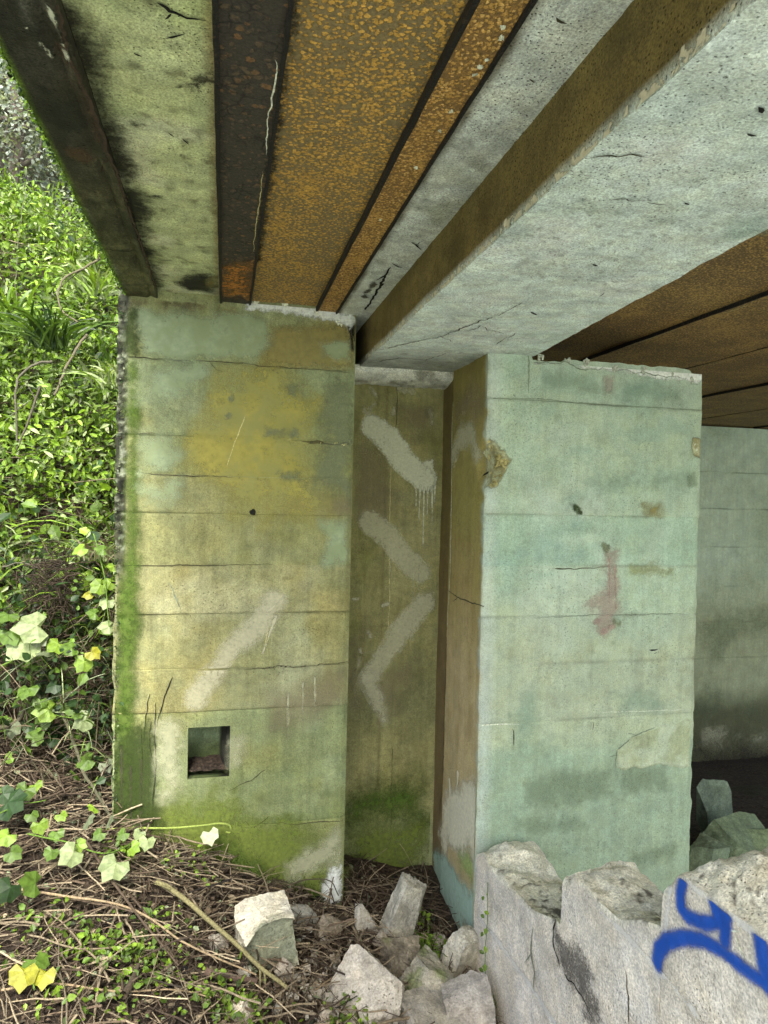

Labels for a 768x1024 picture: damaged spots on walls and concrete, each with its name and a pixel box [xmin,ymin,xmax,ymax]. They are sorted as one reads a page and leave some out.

leakage [47,3,219,293]
rust [222,0,468,306]
crack [371,304,520,363]